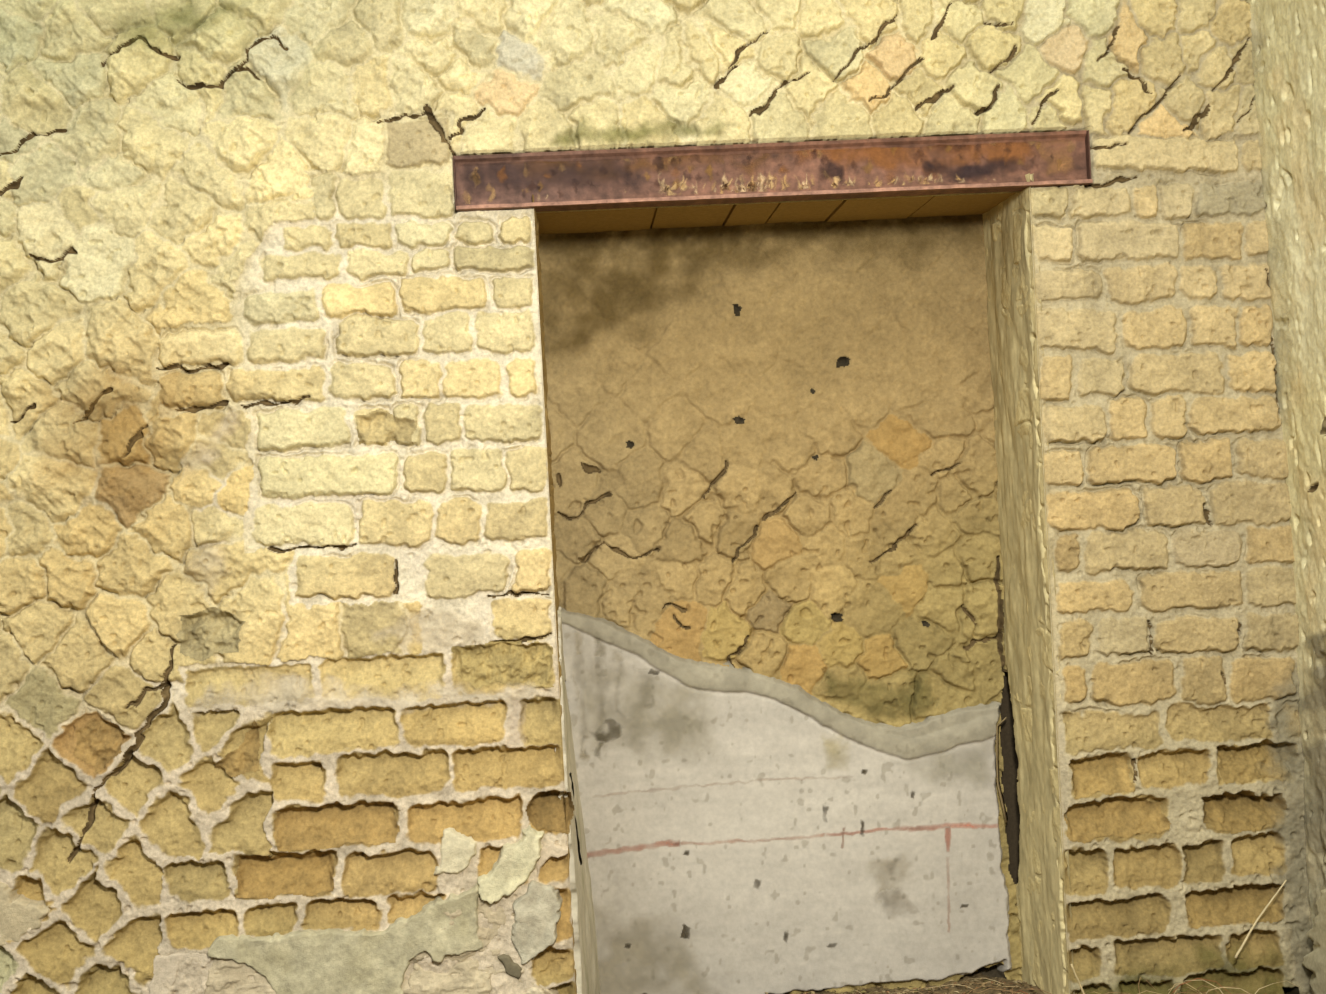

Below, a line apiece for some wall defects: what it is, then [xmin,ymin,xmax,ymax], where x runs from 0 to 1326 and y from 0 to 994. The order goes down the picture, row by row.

crack [0,129,67,196]
crack [101,34,288,90]
crack [377,104,486,156]
corrosion [977,143,1041,160]
crack [1085,26,1181,188]
crack [1183,37,1254,131]
crack [29,247,78,263]
crack [121,362,310,458]
crack [556,462,613,521]
crack [67,644,177,864]
crack [961,556,1020,884]
peeling [204,790,575,994]